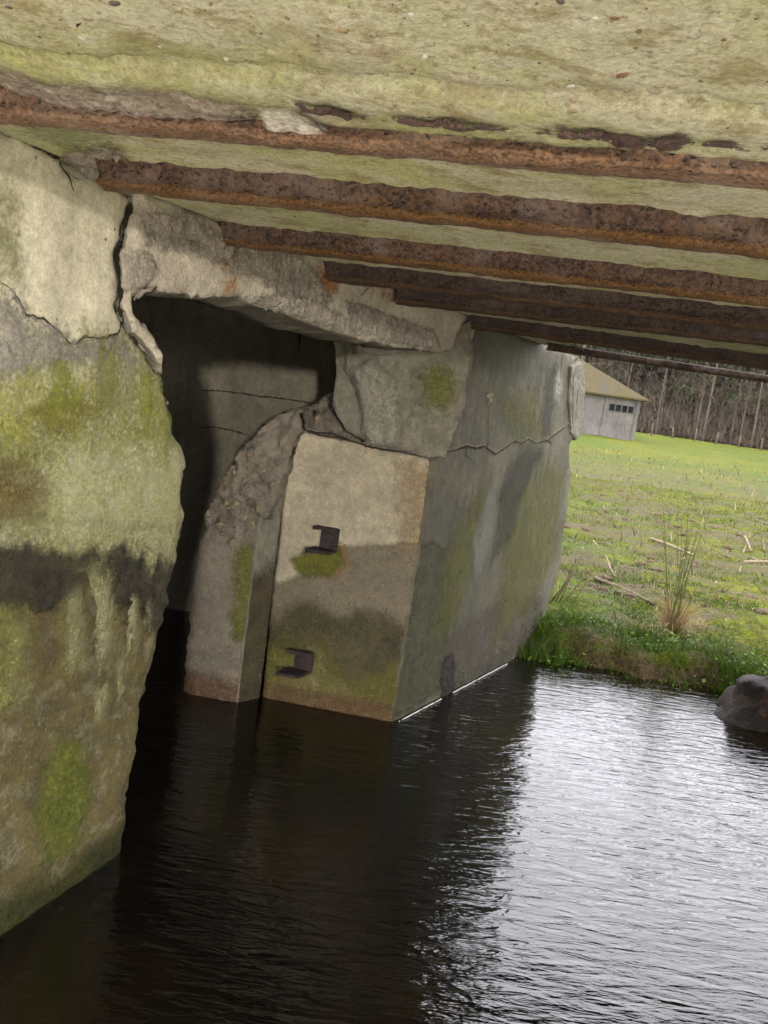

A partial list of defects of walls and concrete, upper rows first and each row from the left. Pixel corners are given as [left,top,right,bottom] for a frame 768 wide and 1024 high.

spalling [49,145,133,180]
spalling [0,71,508,135]
spalling [616,72,662,95]
spalling [533,121,768,152]
spalling [0,293,135,378]
crack [0,195,172,423]
spalling [124,208,441,350]
crack [200,376,578,459]
damp [474,366,562,572]
damp [0,455,181,936]